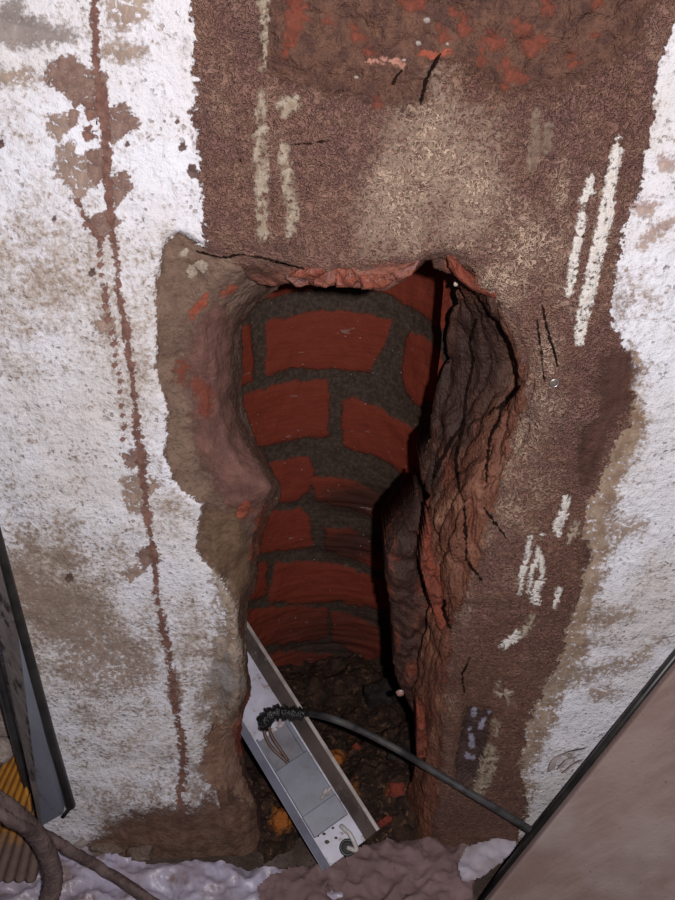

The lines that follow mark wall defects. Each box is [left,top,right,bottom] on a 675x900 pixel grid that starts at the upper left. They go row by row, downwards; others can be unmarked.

crack [419,53,441,105]
corrosion [187,164,200,179]
crack [196,250,305,270]
corrosion [43,0,190,826]
crack [432,319,521,581]
crack [537,304,559,381]
leakage [9,548,157,695]
spalling [154,232,538,839]
leakage [498,341,668,819]